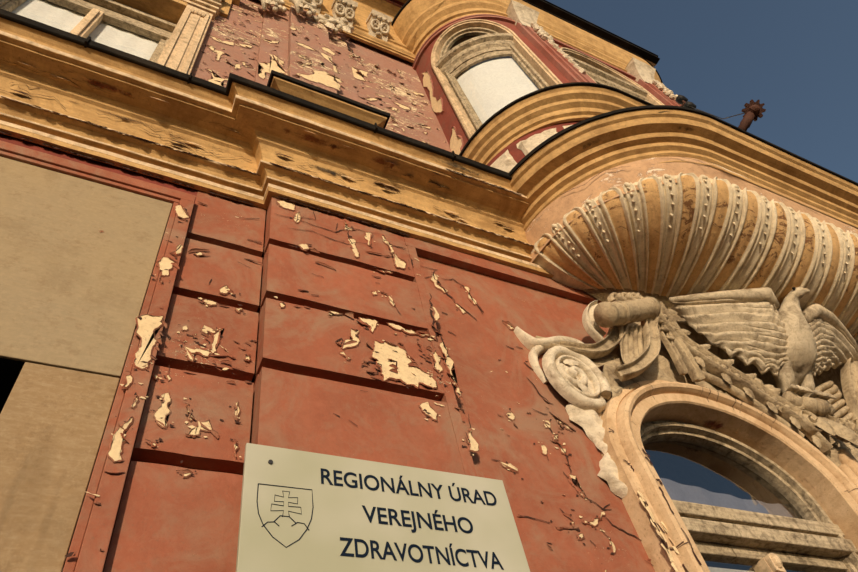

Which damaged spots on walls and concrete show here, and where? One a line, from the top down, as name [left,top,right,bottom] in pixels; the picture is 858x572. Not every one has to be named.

peeling [199,4,444,144]
peeling [42,144,194,188]
peeling [444,126,464,155]
peeling [151,232,210,284]
peeling [174,204,190,223]
peeling [276,196,419,275]
peeling [198,279,246,314]
peeling [104,314,257,473]
peeling [327,293,480,456]
peeling [492,459,523,479]
peeling [527,407,587,500]
peeling [519,509,585,545]